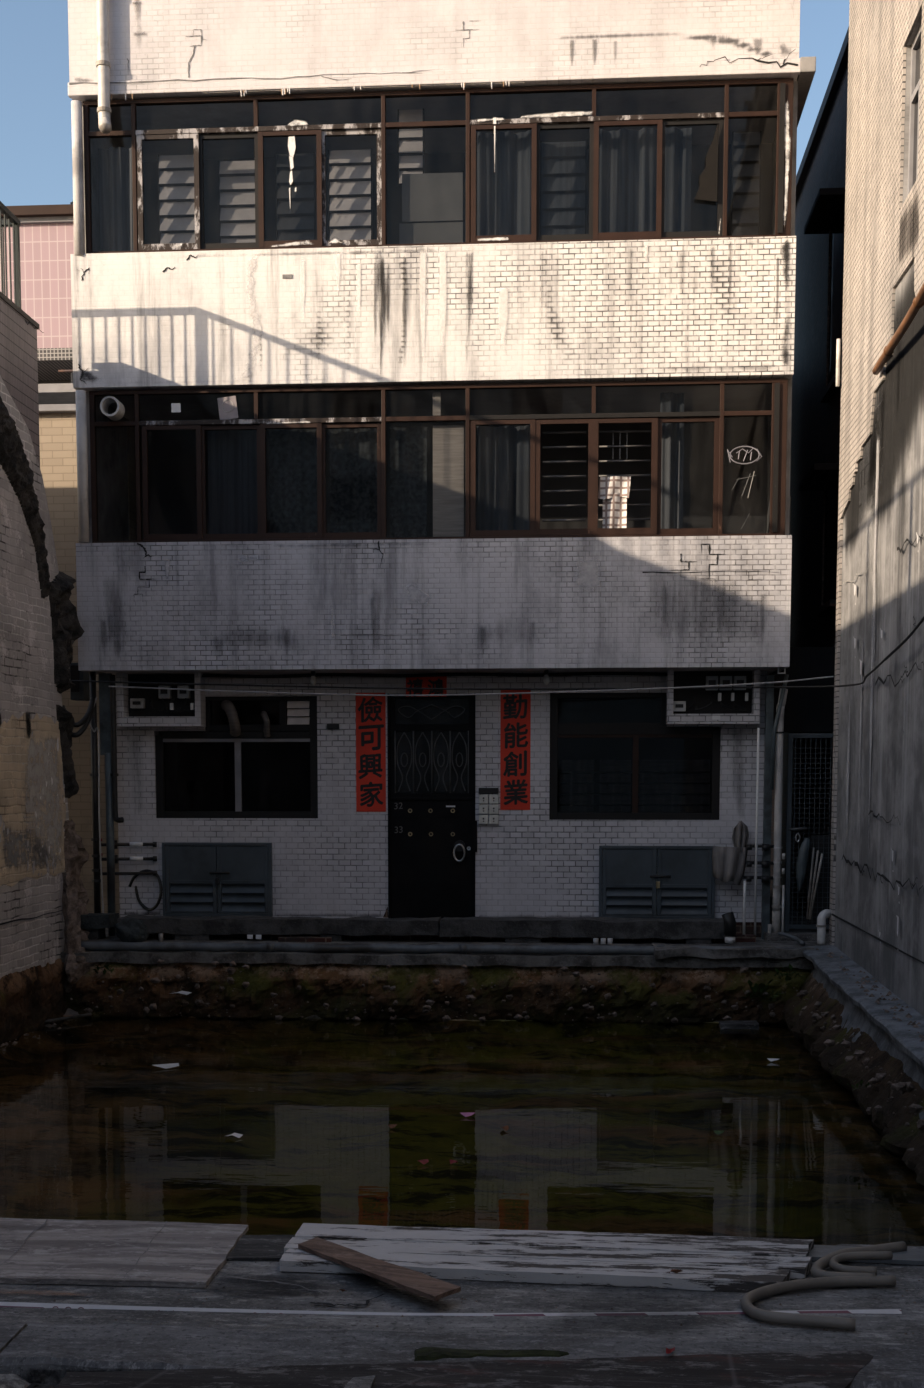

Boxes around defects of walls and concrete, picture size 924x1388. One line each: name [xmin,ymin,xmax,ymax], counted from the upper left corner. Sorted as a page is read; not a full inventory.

crack [701,50,798,68]
damp [374,261,406,366]
damp [845,202,924,826]
crack [642,544,766,580]
crack [875,662,924,687]